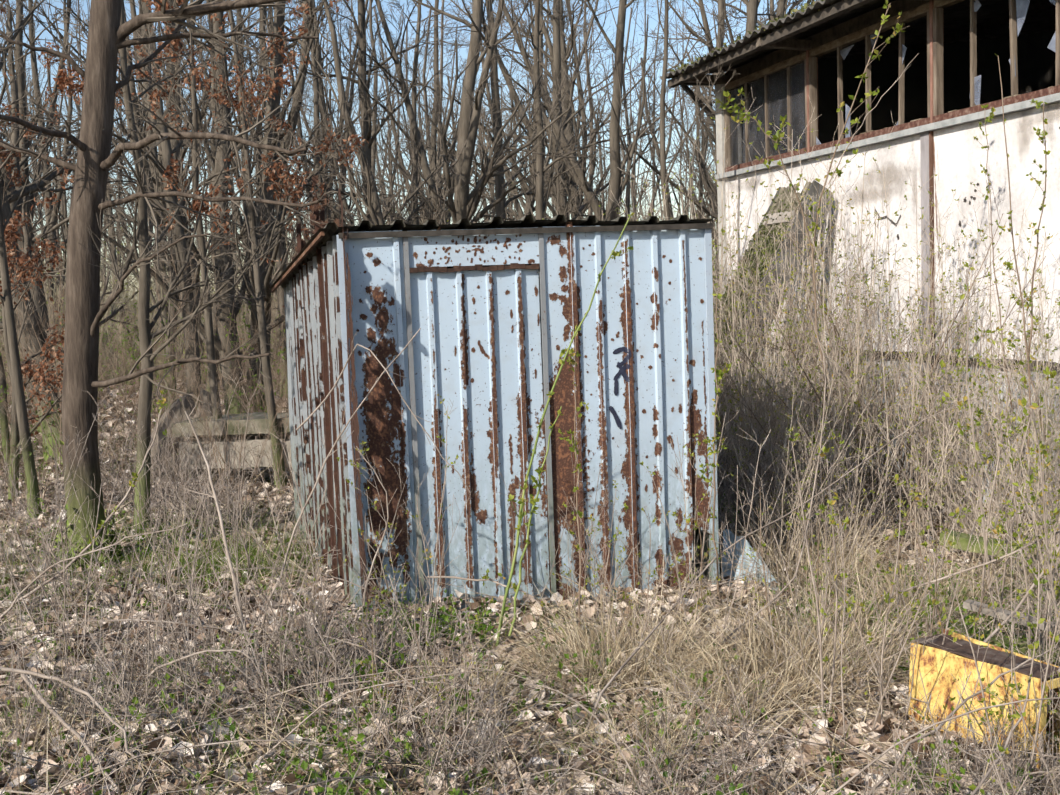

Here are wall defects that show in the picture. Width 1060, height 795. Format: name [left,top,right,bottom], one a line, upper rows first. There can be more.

corrosion [289,175,412,613]
corrosion [413,222,712,603]